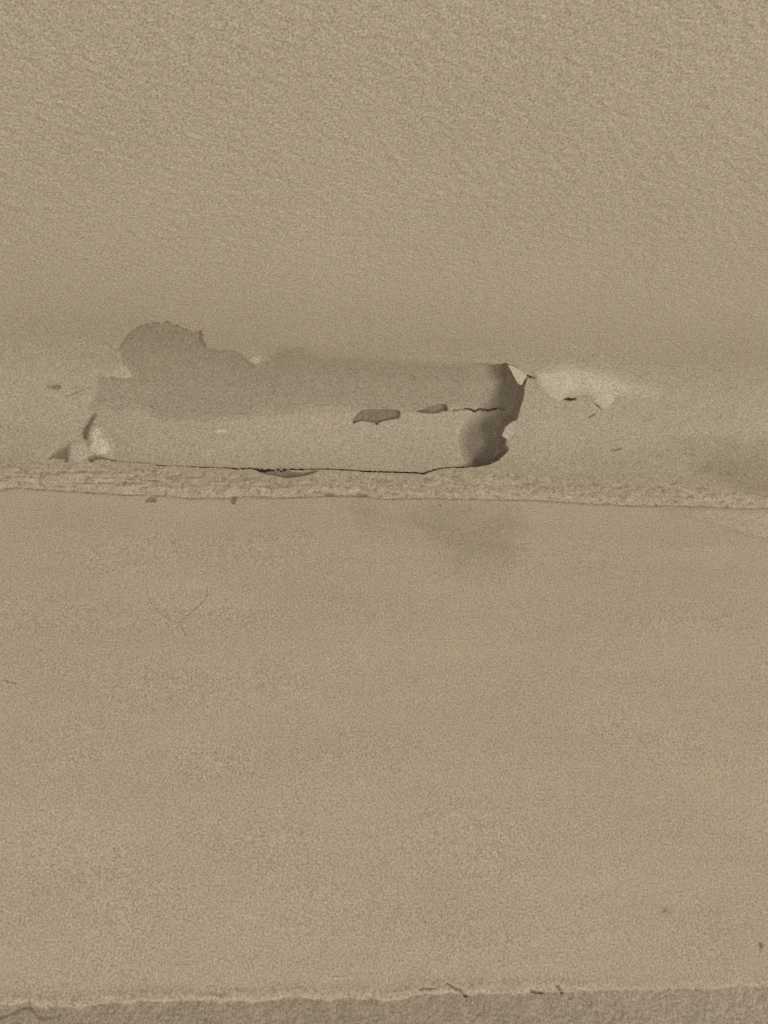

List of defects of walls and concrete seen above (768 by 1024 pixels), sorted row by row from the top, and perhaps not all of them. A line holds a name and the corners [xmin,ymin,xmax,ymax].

flaking render [85,321,536,474]
spalling [46,441,71,463]
crack [157,465,477,478]